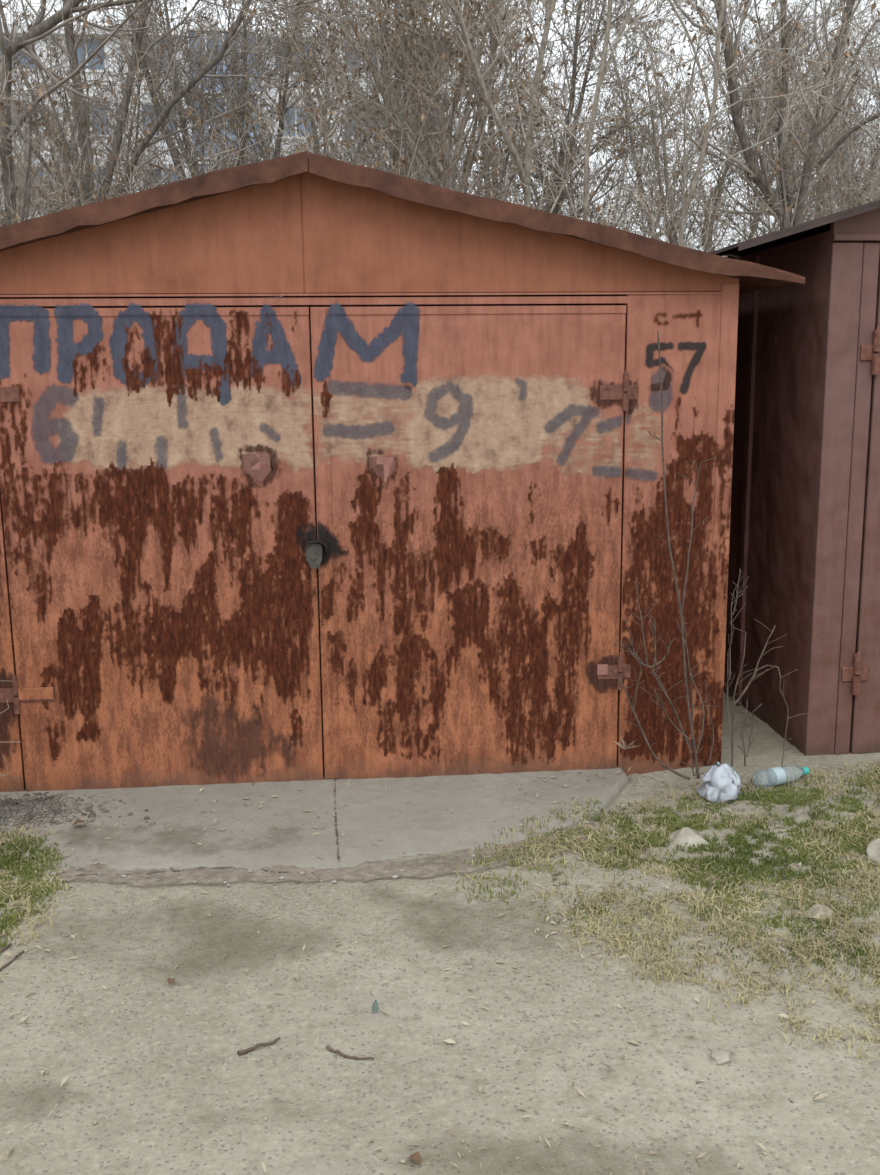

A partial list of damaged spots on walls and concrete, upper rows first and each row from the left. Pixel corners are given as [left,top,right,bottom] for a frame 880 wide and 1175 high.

corrosion [239,444,280,487]
corrosion [367,448,398,488]
corrosion [0,670,13,689]
corrosion [0,702,16,767]